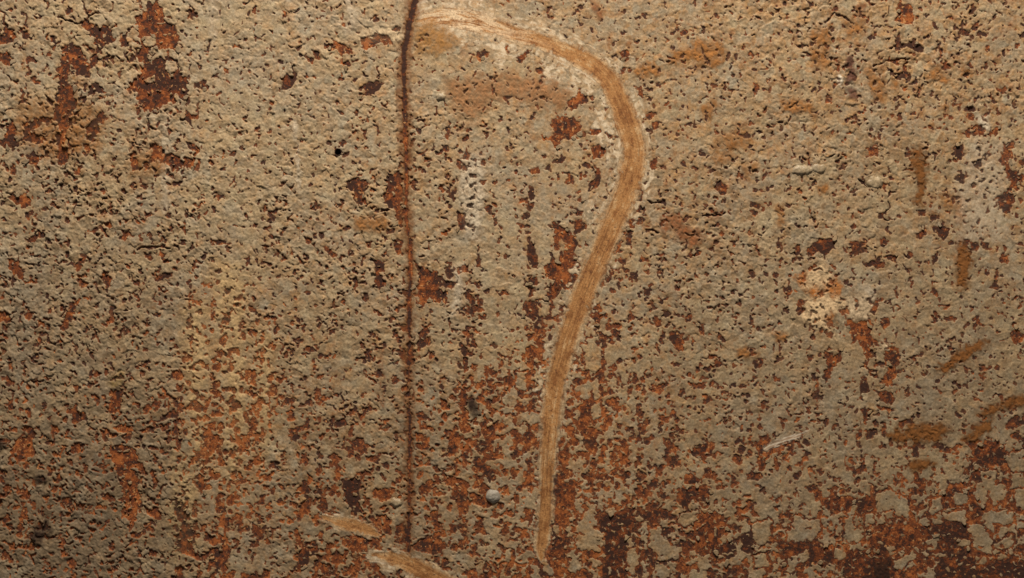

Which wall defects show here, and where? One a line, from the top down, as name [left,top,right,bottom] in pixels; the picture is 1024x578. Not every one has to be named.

rust [0,1,228,175]
rust [183,265,248,448]
crack [397,0,420,554]
rust [441,212,470,235]
rust [585,304,606,329]
rust [1010,324,1024,345]
rust [106,386,145,530]
rust [170,462,211,553]
rust [594,504,646,578]
rust [675,441,730,559]
rust [753,434,791,469]
rust [774,394,1024,578]